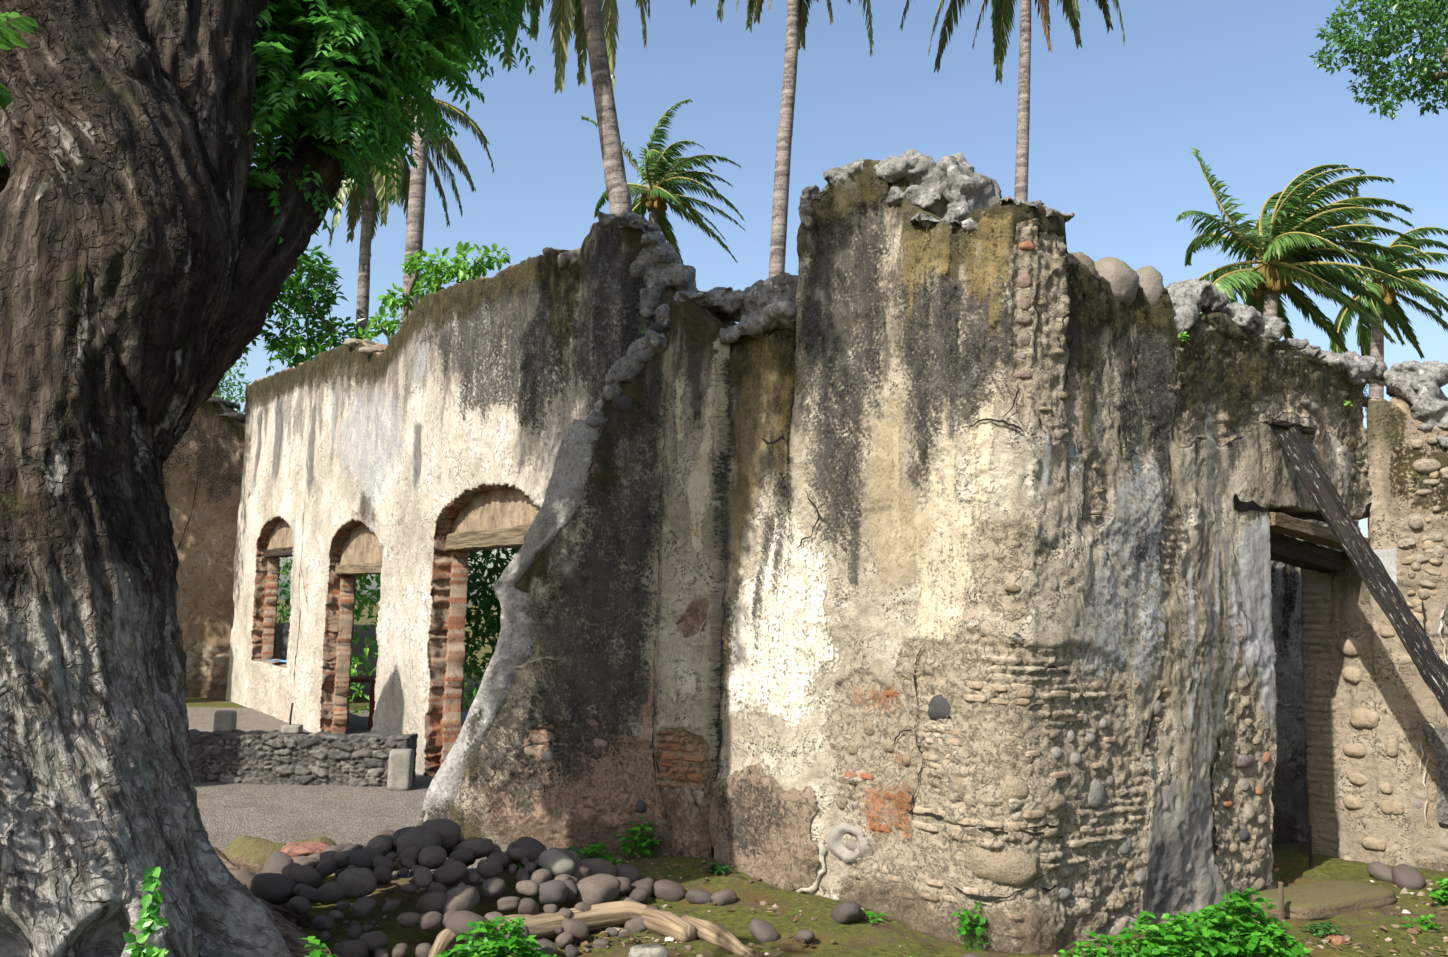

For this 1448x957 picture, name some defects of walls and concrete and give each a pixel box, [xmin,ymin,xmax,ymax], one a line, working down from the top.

leakage [306,381,421,532]
leakage [415,181,1021,859]
spalling [940,218,1074,622]
spalling [1082,451,1112,529]
leakage [1041,256,1369,797]
peeling [1269,560,1284,621]
spalling [1438,608,1448,665]
spalling [487,718,715,859]
spalling [825,628,1173,954]
spalling [1210,684,1277,898]